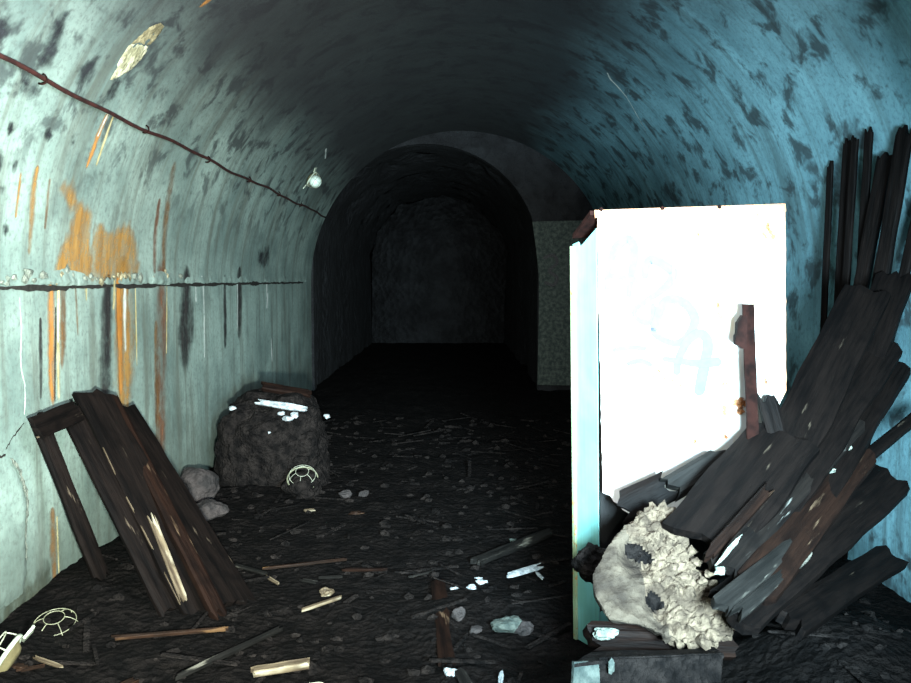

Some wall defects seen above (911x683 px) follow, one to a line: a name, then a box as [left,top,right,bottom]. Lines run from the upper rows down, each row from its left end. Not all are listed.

water stain [38,13,68,66]
spalling [110,23,164,80]
corrosion [48,290,65,401]